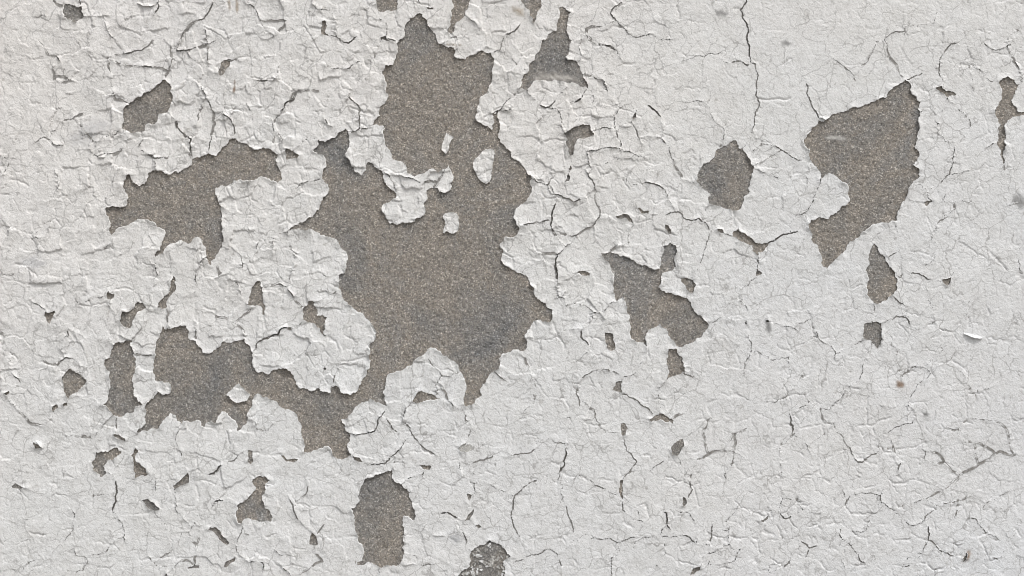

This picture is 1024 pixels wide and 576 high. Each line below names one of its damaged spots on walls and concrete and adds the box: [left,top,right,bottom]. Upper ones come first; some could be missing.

crack [37,0,328,167]
crack [194,233,303,355]
peeling [100,0,553,462]
crack [428,2,747,574]
peeling [601,225,709,384]
peeling [693,140,769,276]
crack [685,0,1023,571]
peeling [800,80,923,304]
crack [236,486,325,575]
peeling [348,470,416,568]
crack [353,403,435,492]
spalling [458,540,510,576]